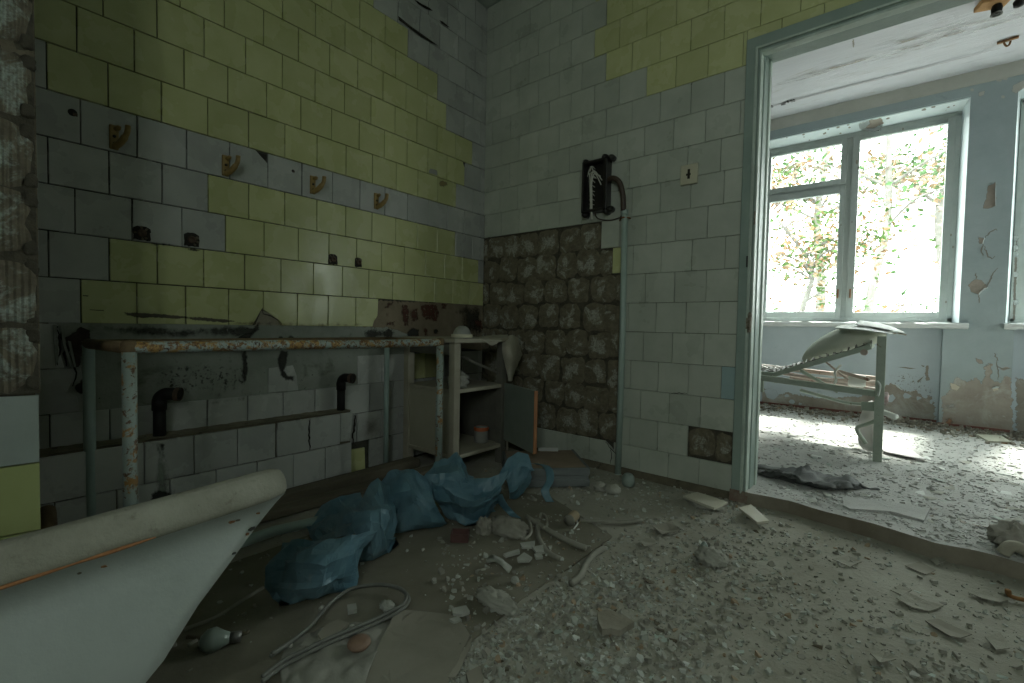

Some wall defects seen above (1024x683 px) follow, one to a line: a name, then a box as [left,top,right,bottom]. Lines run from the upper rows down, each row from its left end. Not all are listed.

peeling [0,0,620,443]
peeling [983,182,997,209]
crack [975,229,998,303]
peeling [762,358,1024,432]
peeling [688,426,733,464]